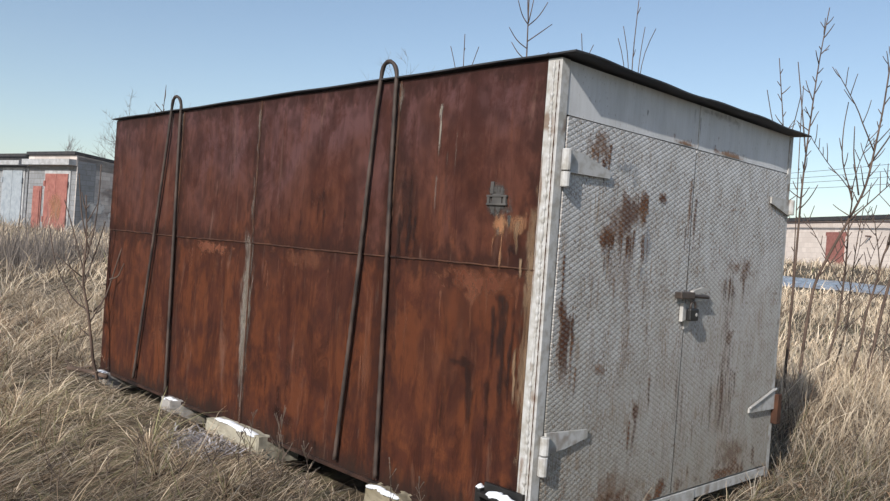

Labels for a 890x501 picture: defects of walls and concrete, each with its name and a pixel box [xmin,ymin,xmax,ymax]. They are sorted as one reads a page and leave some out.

corrosion [592,132,612,181]
corrosion [189,240,236,263]
corrosion [599,191,666,270]
corrosion [435,266,519,322]
corrosion [557,255,576,393]
corrosion [713,460,743,480]